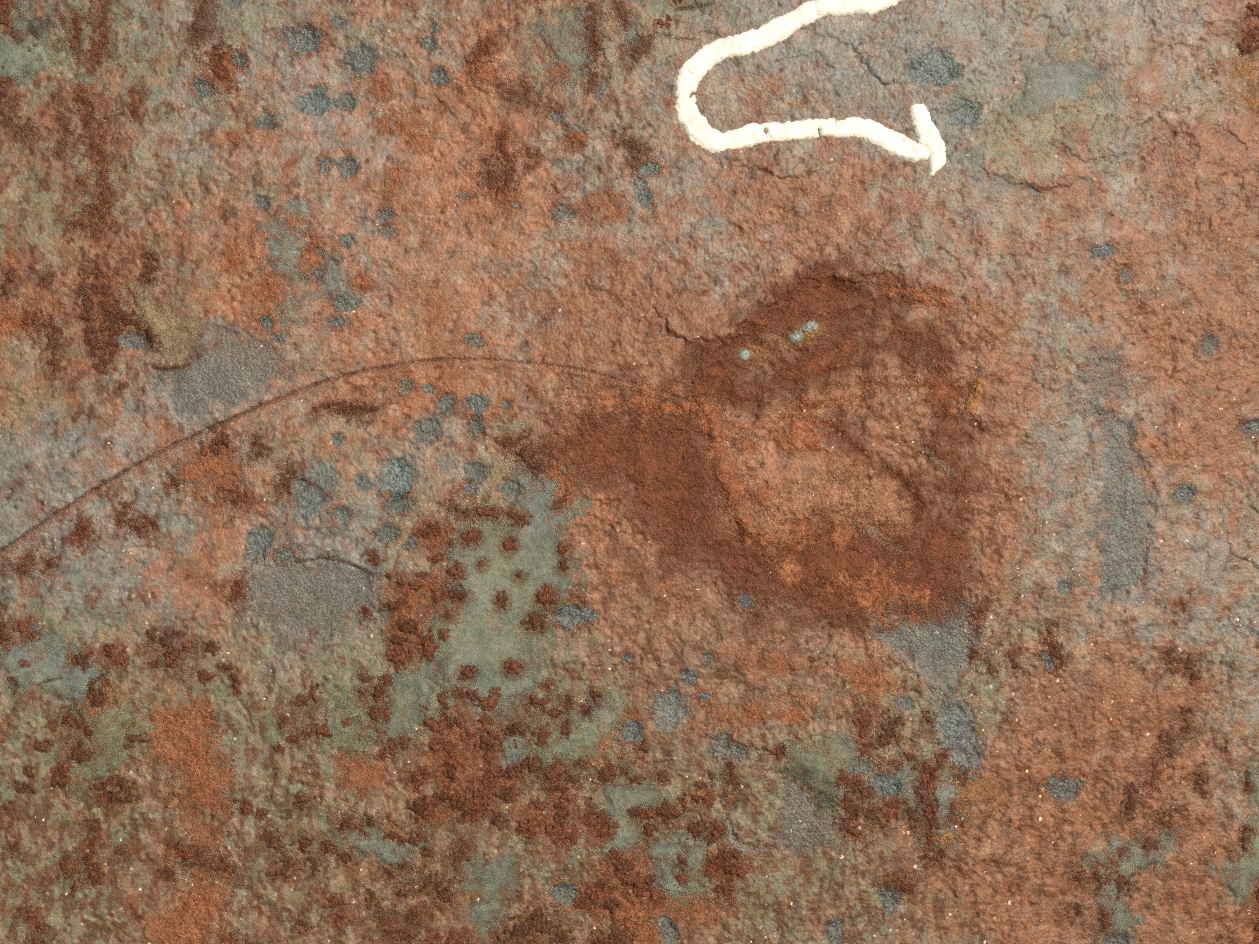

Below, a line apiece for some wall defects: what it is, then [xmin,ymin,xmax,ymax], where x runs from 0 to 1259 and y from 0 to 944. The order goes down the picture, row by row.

rust [75,269,162,372]
rust [588,372,883,457]
rust [0,644,129,813]
rust [54,776,139,892]
rust [146,628,241,696]
rust [233,791,354,882]
rust [273,683,351,753]
crack [296,558,373,576]
rust [358,503,532,722]
rust [364,658,746,944]
rust [745,467,941,628]
rust [834,662,998,869]